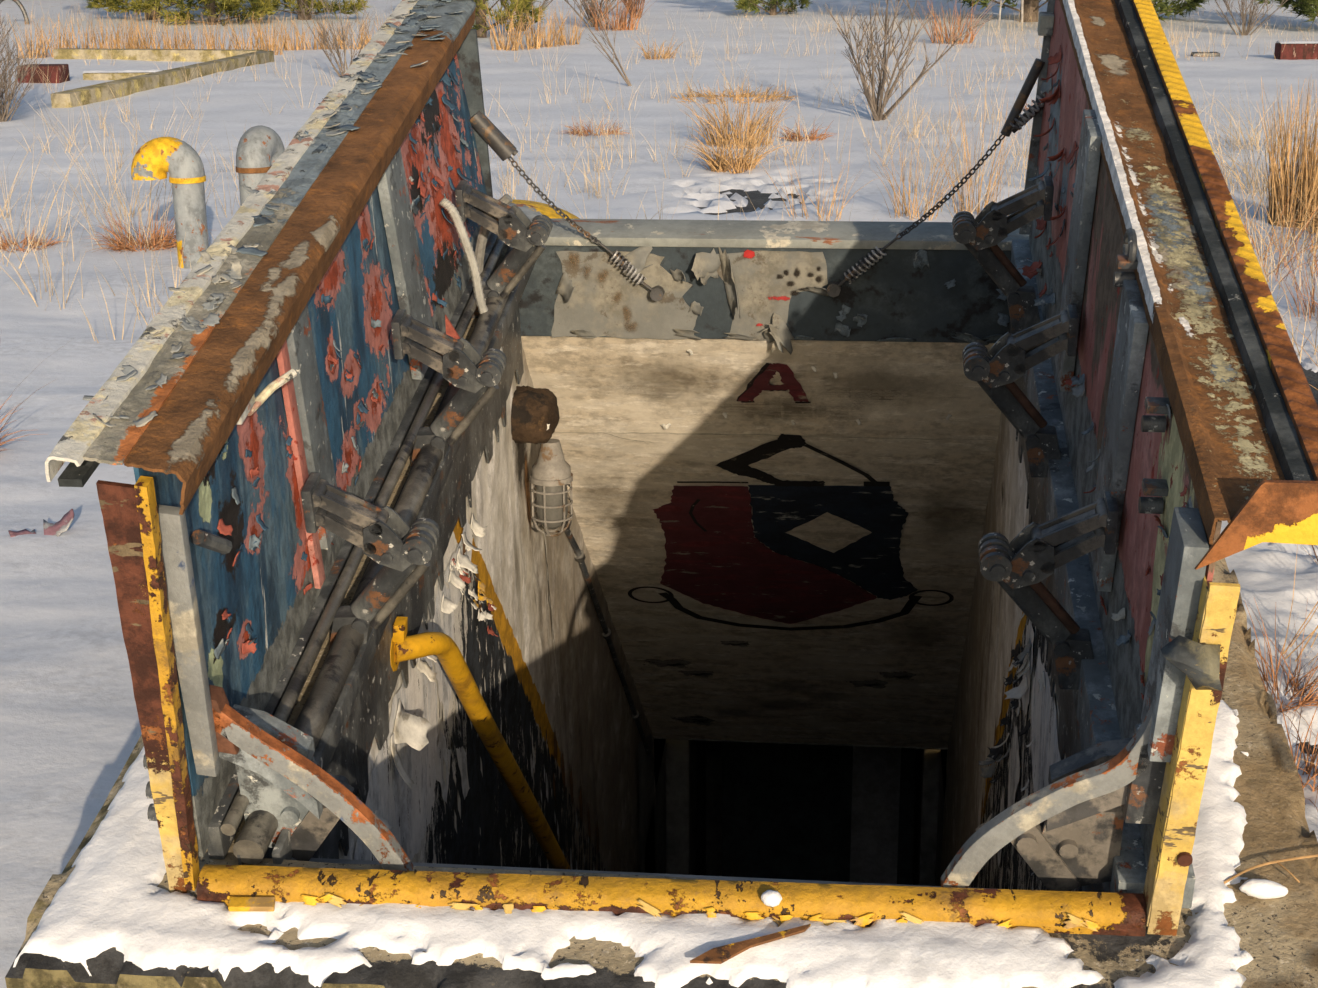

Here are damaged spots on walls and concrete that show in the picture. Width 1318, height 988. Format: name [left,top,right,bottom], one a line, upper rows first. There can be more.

peeling [298,0,465,154]
peeling [241,184,285,227]
peeling [409,54,478,238]
peeling [1022,45,1079,306]
peeling [150,243,268,359]
peeling [551,246,829,355]
peeling [83,365,158,428]
peeling [214,608,257,659]
peeling [217,513,269,566]
peeling [418,513,498,641]
peeling [365,655,483,862]
peeling [354,837,378,861]